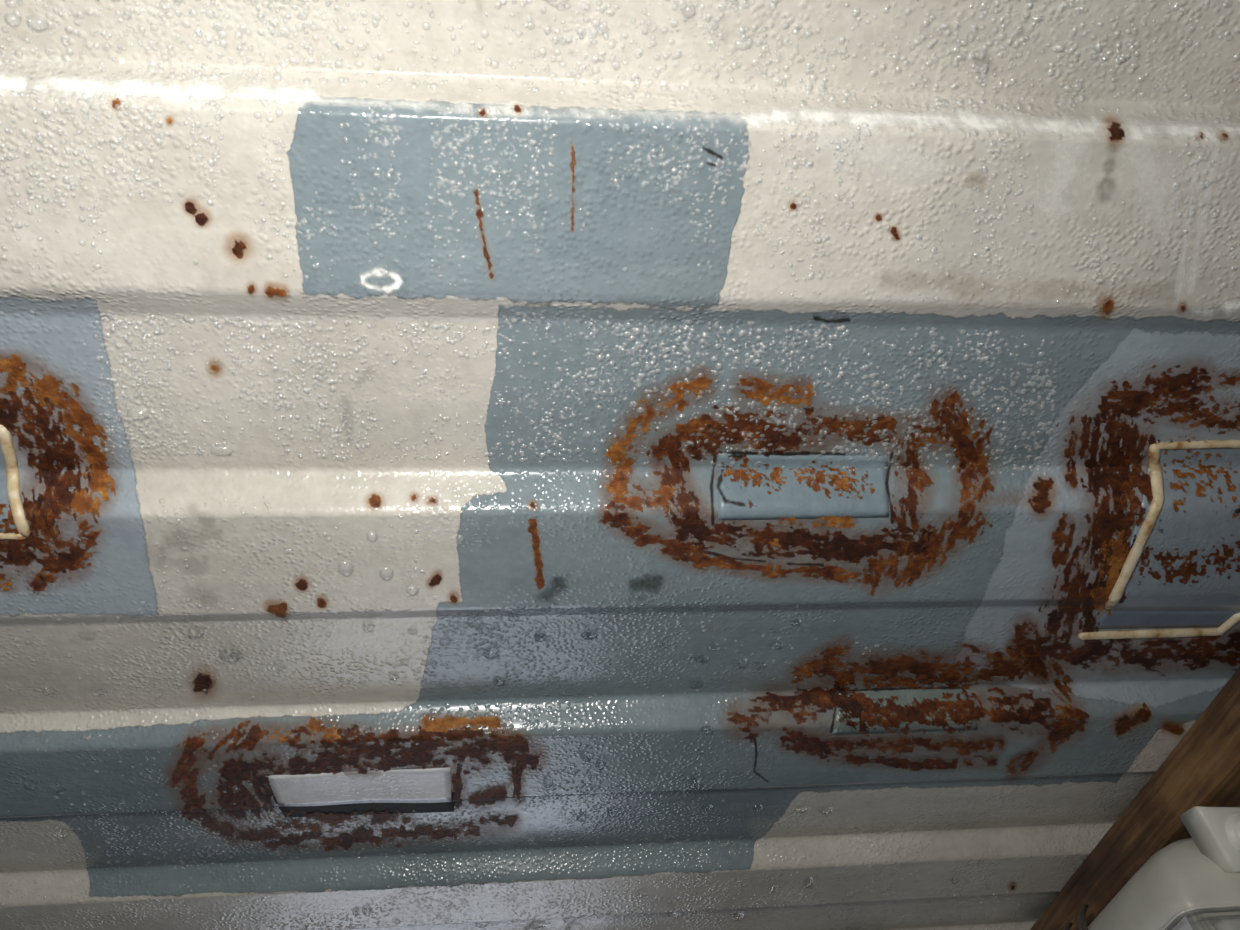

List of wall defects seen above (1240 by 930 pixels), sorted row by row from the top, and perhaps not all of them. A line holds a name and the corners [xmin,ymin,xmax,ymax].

rust [185,202,208,226]
rust [232,241,246,258]
rust [248,285,286,297]
rust [473,189,494,278]
rust [0,354,115,595]
rust [600,375,994,595]
rust [267,603,287,619]
rust [528,502,544,589]
rust [728,365,1240,774]
rust [171,716,541,851]